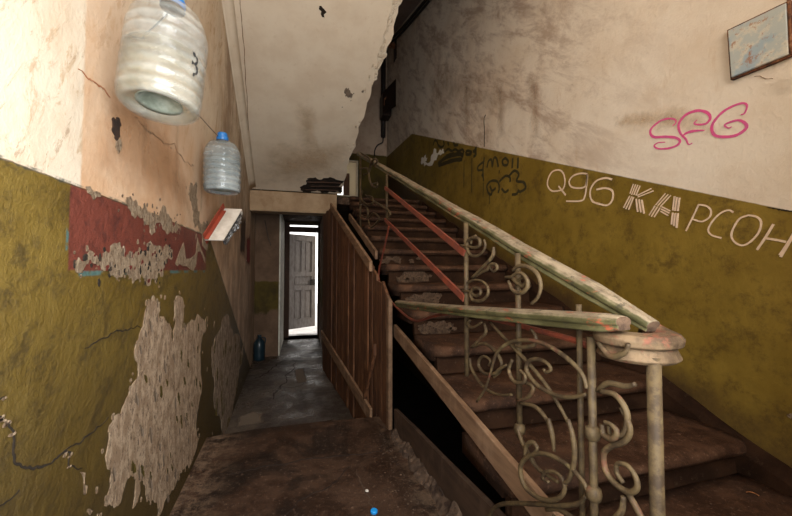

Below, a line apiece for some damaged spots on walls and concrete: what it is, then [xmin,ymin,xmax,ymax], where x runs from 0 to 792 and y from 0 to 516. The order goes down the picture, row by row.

crack [78,69,111,98]
crack [135,116,194,166]
crack [87,325,141,348]
peeling [73,182,244,516]
crack [0,396,109,470]